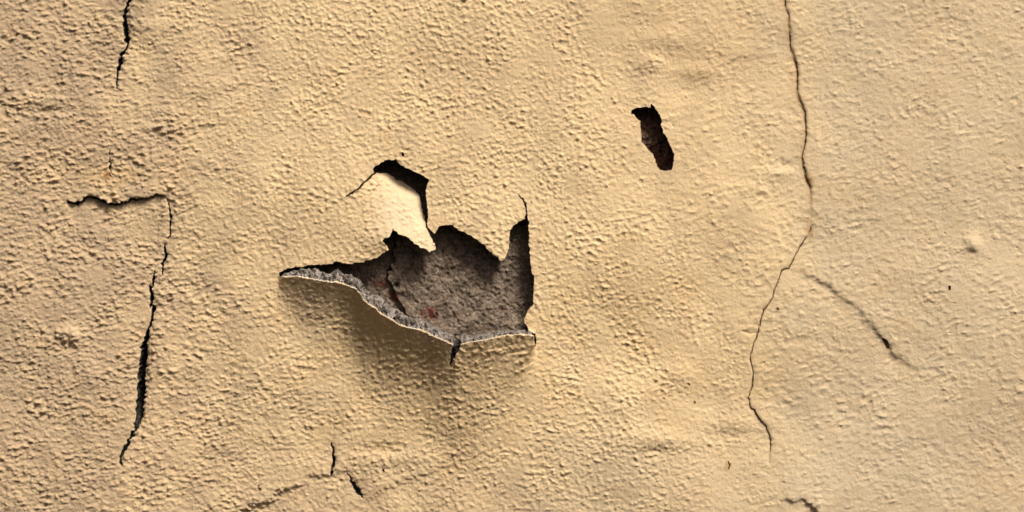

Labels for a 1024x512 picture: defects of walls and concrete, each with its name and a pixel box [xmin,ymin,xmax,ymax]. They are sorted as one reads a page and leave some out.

crack [63,0,175,467]
spalling [279,150,537,346]
hole [631,104,674,171]
crack [739,0,922,466]